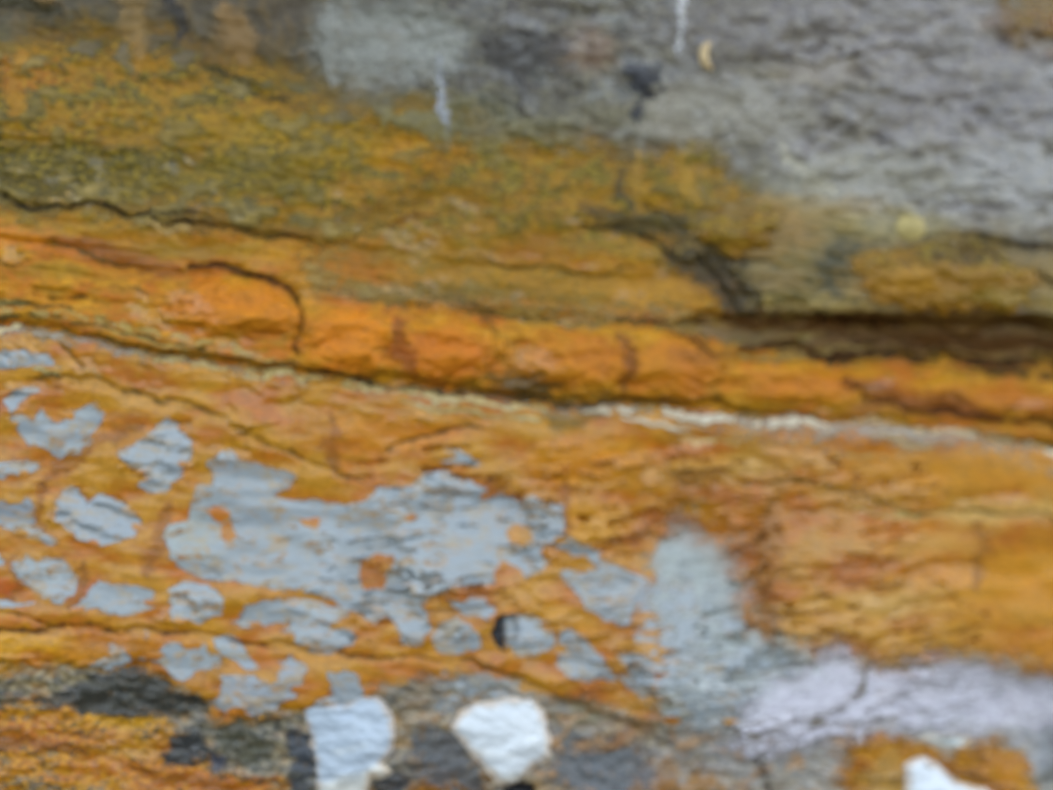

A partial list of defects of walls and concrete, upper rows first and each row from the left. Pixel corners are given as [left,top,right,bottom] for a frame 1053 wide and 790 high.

crack [0,193,358,248]
rust [0,23,754,323]
water stain [485,29,572,115]
water stain [582,168,763,317]
water stain [621,63,841,197]
crack [0,262,721,410]
crack [419,223,1053,425]
peeling [3,385,105,459]
rust [0,204,1053,724]
peeling [0,417,797,734]
spalling [503,782,533,790]
rust [834,730,1038,790]